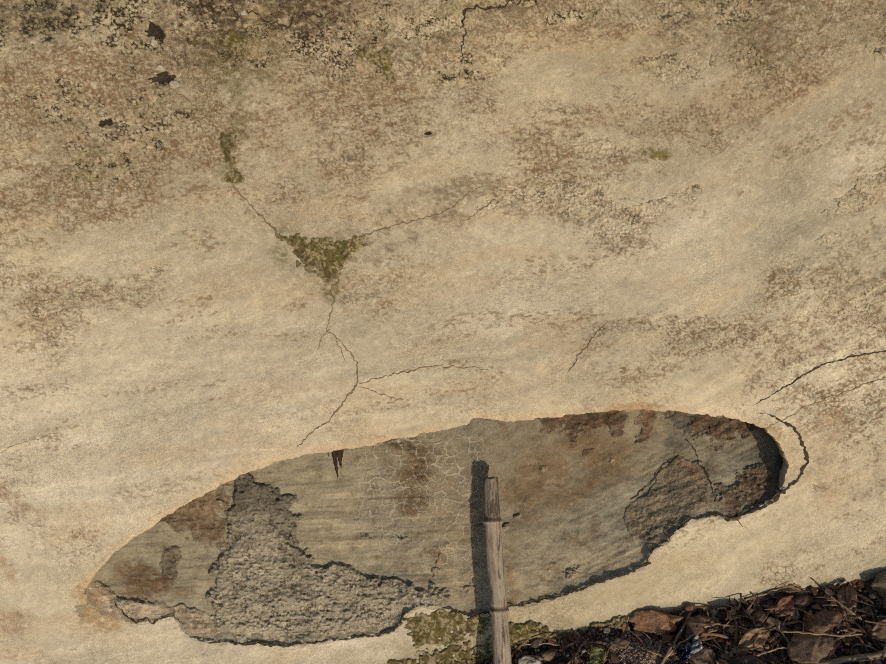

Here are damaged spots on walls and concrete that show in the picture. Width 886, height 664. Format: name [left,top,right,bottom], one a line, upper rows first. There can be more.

leakage [172,0,244,59]
leakage [258,0,350,34]
crack [359,187,496,237]
crack [297,276,487,448]
spalling [73,409,785,648]
crack [113,350,886,647]